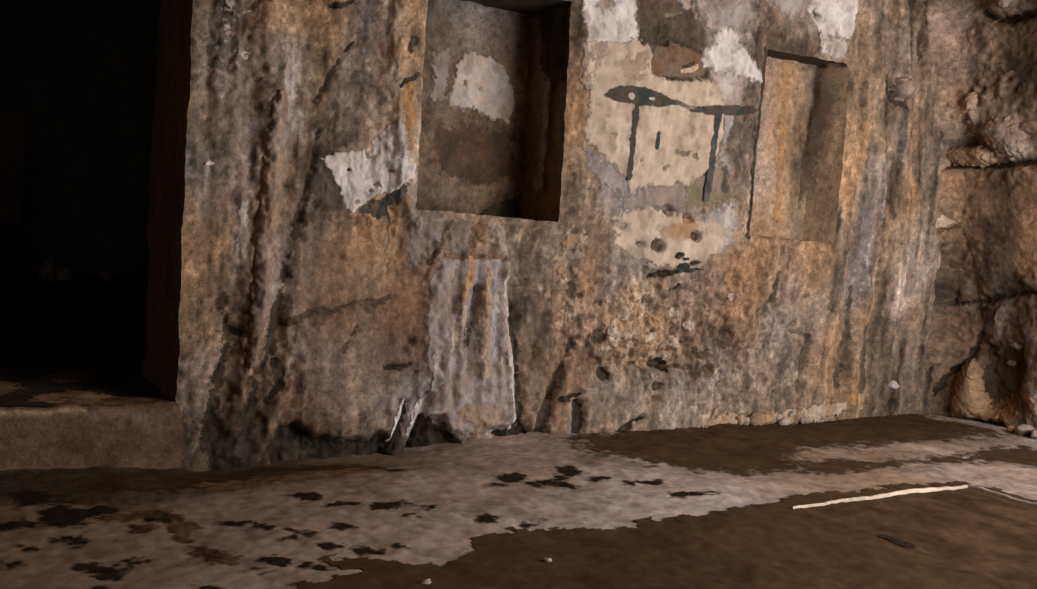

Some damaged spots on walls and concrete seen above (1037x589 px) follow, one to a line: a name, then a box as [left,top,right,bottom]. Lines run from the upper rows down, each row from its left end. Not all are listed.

peeling [583,0,639,47]
peeling [808,0,859,57]
peeling [650,27,763,106]
flaking render [322,118,416,213]
spalling [490,422,527,436]